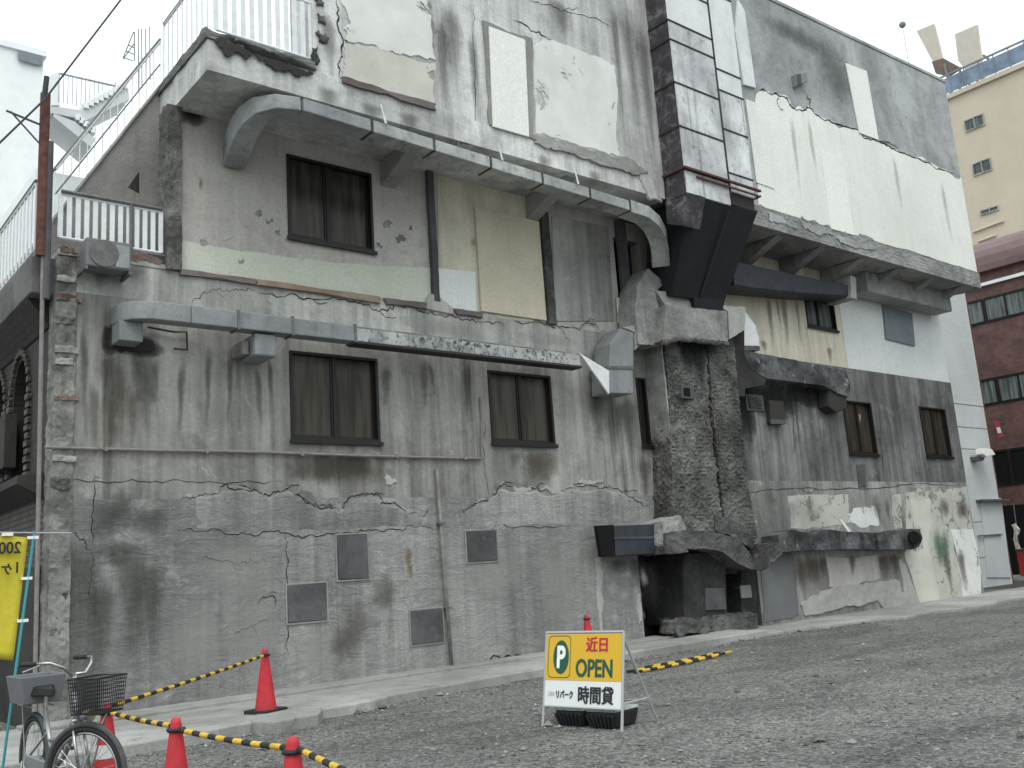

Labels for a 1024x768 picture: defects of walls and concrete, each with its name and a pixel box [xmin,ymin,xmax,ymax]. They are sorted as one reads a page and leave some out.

peeling [214,0,329,77]
peeling [341,0,436,103]
peeling [533,40,648,176]
crack [192,288,604,341]
crack [74,477,434,655]
peeling [787,486,981,616]